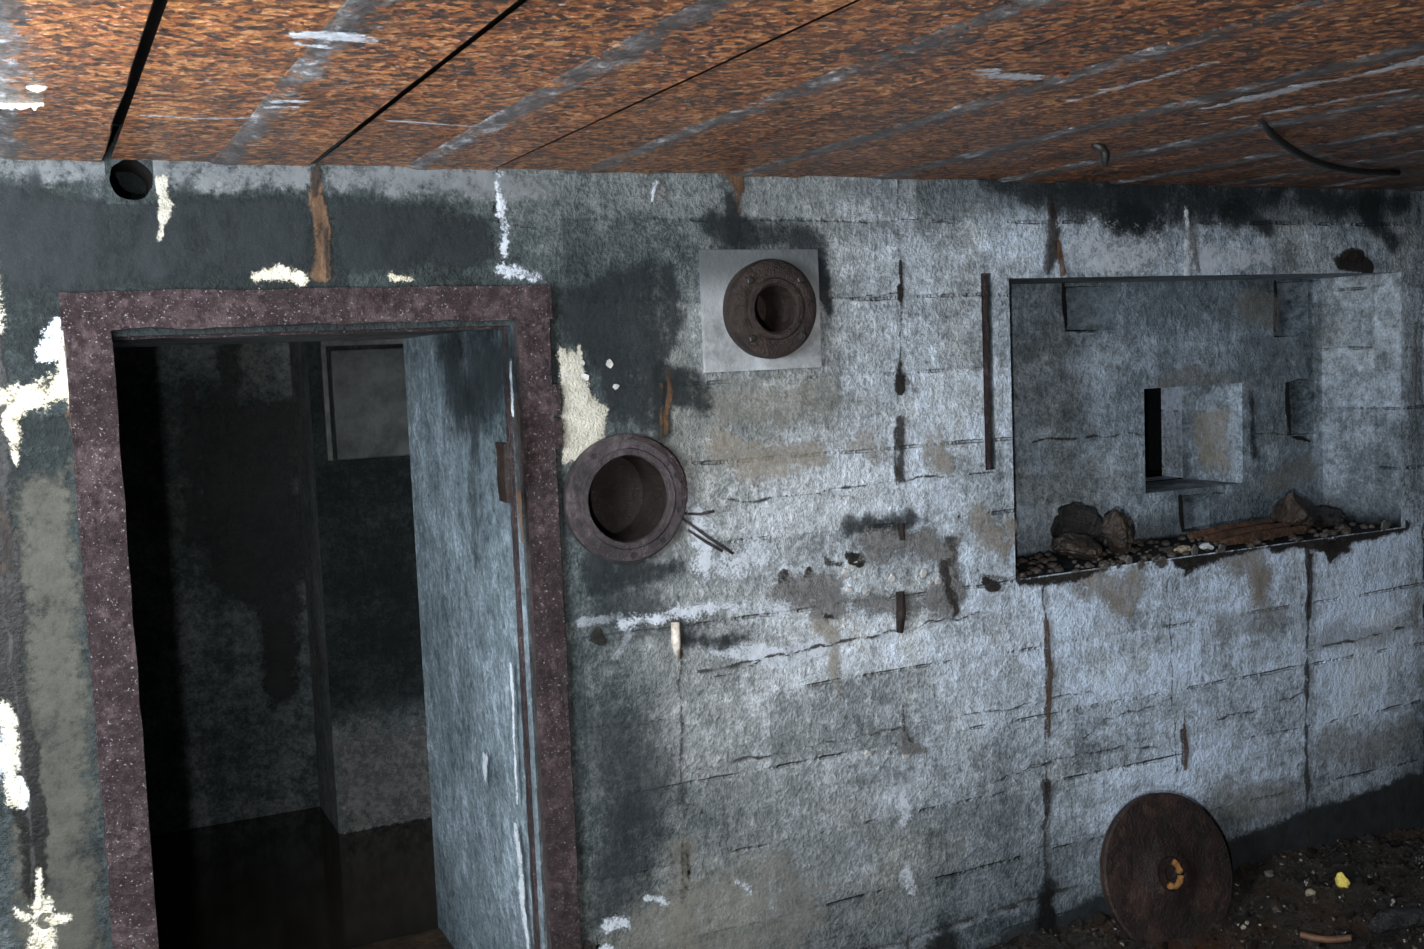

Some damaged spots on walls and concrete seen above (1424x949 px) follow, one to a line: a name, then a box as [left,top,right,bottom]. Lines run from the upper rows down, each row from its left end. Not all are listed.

rust [309,166,331,282]
damp [703,193,832,315]
damp [563,261,713,440]
damp [0,158,558,949]
damp [580,494,777,592]
damp [619,603,849,672]
crack [1216,524,1424,850]
crack [595,580,1178,949]
damp [897,789,912,825]
damp [599,918,629,949]
damp [900,867,916,895]
damp [925,927,957,949]